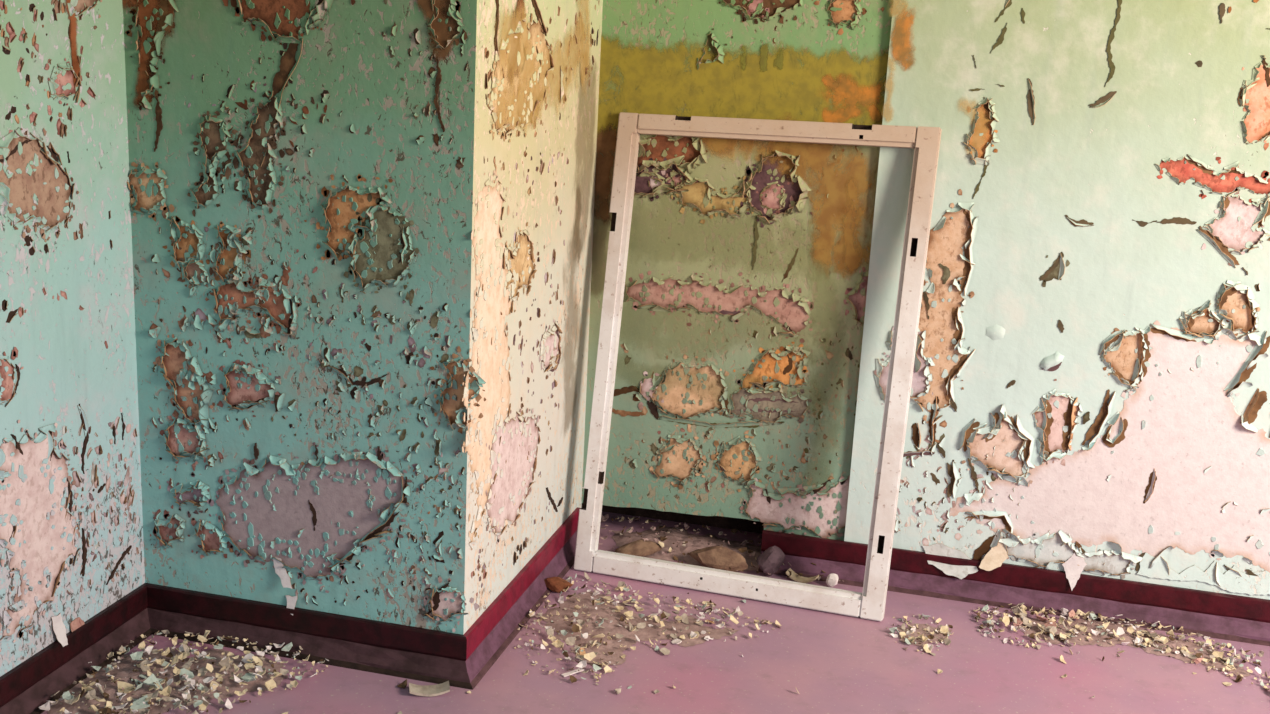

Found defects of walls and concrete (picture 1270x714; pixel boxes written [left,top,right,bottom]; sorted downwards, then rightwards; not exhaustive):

peeling [0,0,102,256]
damp [497,0,889,132]
peeling [696,28,733,70]
peeling [719,0,885,44]
peeling [1238,55,1270,150]
peeling [0,347,24,407]
peeling [2,299,26,323]
peeling [623,135,860,540]
peeling [843,267,869,327]
peeling [874,326,894,405]
peeling [894,154,1270,595]
peeling [0,407,139,652]